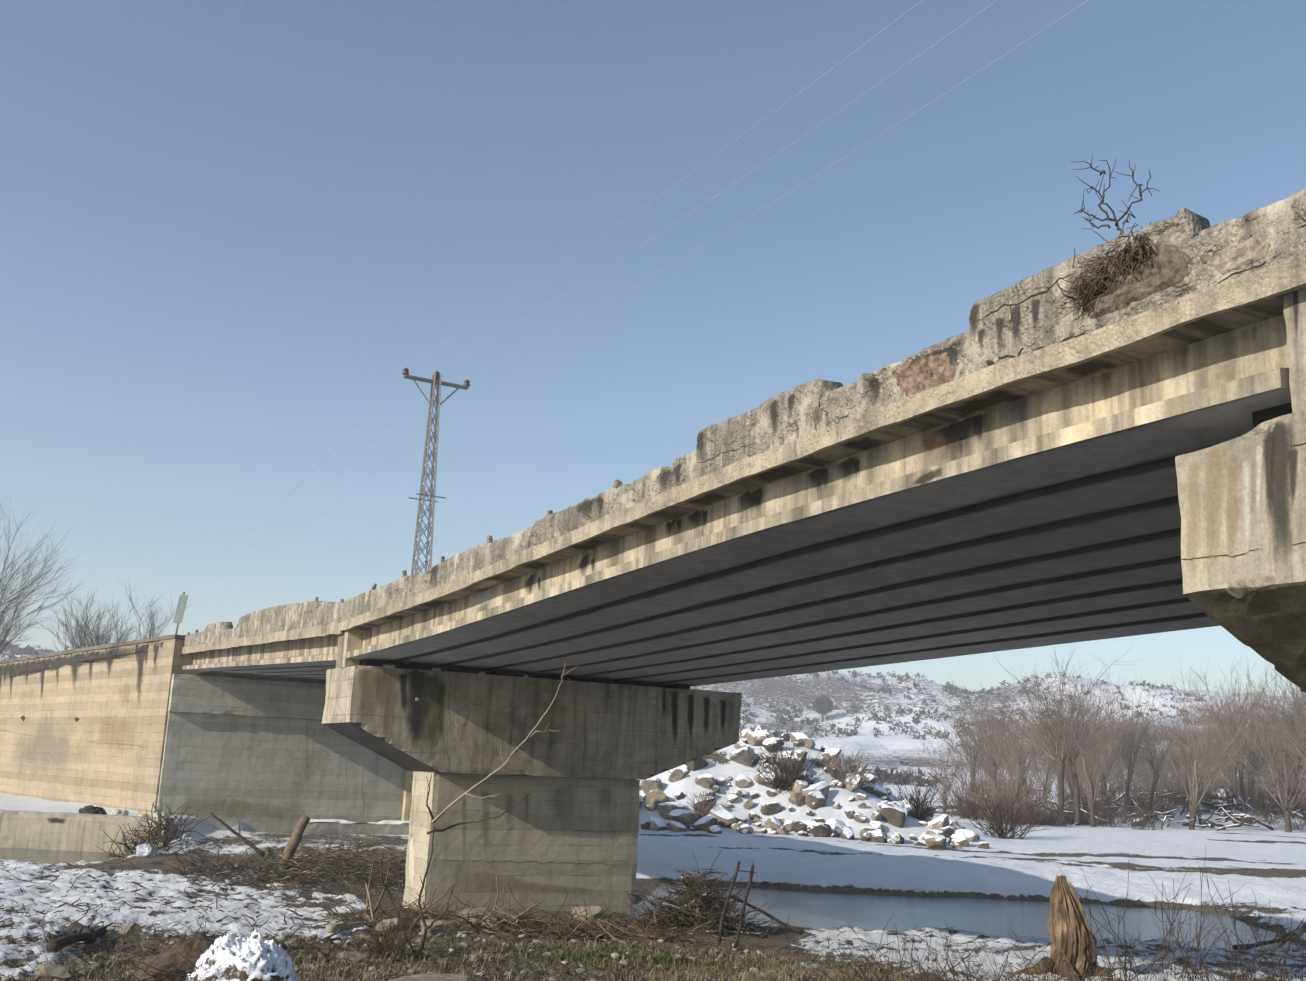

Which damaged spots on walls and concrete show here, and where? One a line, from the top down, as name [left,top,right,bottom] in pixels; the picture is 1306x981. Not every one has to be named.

spalling [810,402,823,430]
water stain [1244,423,1297,543]
water stain [0,642,163,696]
water stain [399,670,444,743]
water stain [662,689,726,742]